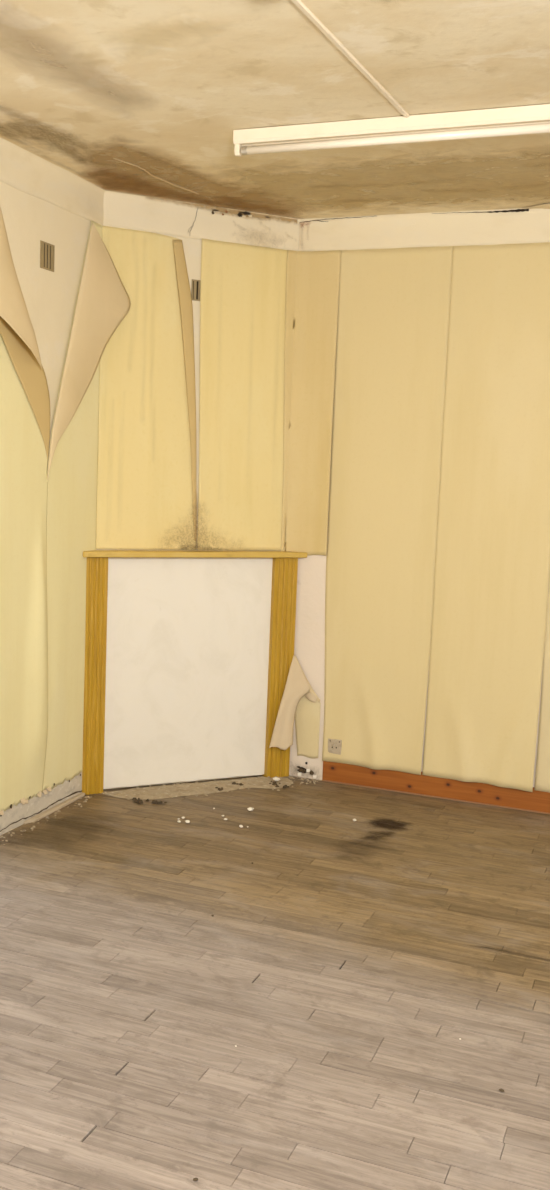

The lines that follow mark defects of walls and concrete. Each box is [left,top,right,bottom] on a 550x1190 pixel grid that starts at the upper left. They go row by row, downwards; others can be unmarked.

leakage [90,146,550,223]